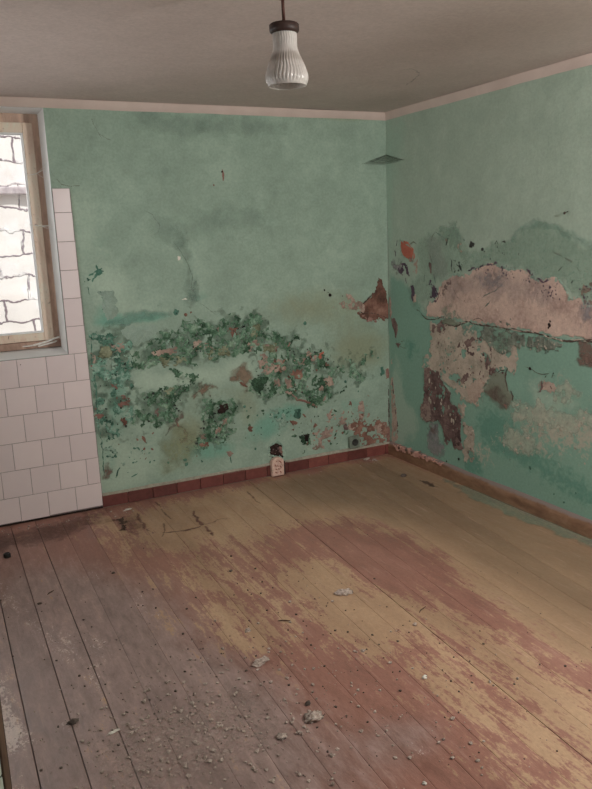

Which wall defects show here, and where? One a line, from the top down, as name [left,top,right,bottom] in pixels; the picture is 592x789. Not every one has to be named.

peeling [399,239,416,263]
flaking render [333,278,403,348]
crack [417,310,592,343]
peeling [420,255,592,462]
peeling [243,377,447,466]